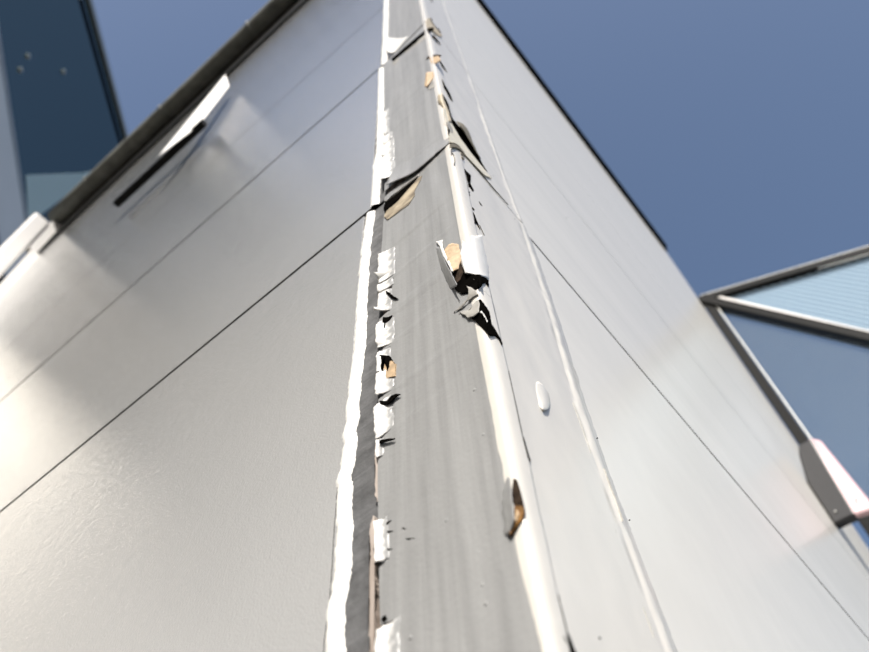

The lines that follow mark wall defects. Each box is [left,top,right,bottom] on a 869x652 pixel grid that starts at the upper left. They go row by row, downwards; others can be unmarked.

peeling [379,18,492,220]
peeling [435,202,503,345]
peeling [373,246,401,458]
peeling [373,516,390,563]
peeling [502,477,525,537]
peeling [374,616,401,652]